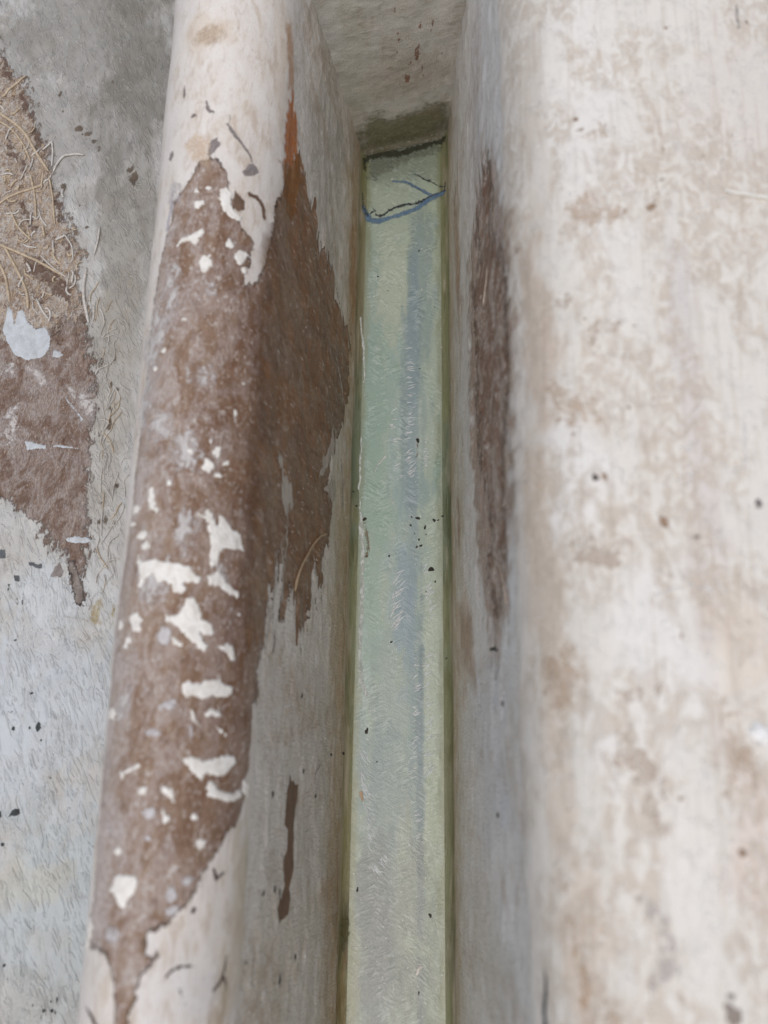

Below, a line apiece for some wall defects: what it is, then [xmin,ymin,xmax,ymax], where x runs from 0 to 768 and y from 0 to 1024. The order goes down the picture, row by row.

corrosion [280,89,304,220]
peeling [0,301,119,607]
peeling [86,139,352,1024]